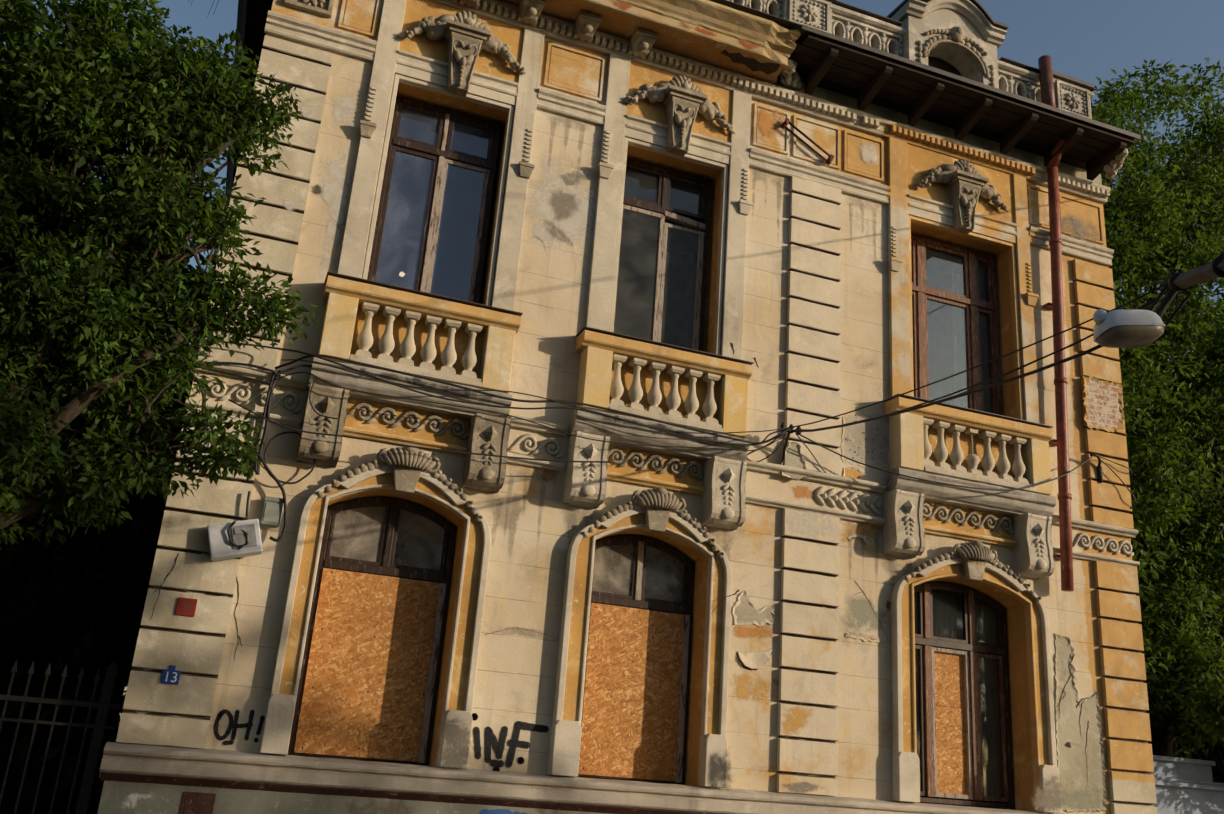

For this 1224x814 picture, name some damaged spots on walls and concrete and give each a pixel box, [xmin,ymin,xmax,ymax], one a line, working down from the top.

damp [548,174,585,245]
spalling [1082,376,1124,432]
crack [150,553,179,620]
crack [234,577,243,653]
spalling [732,591,775,626]
peeling [1054,633,1107,813]